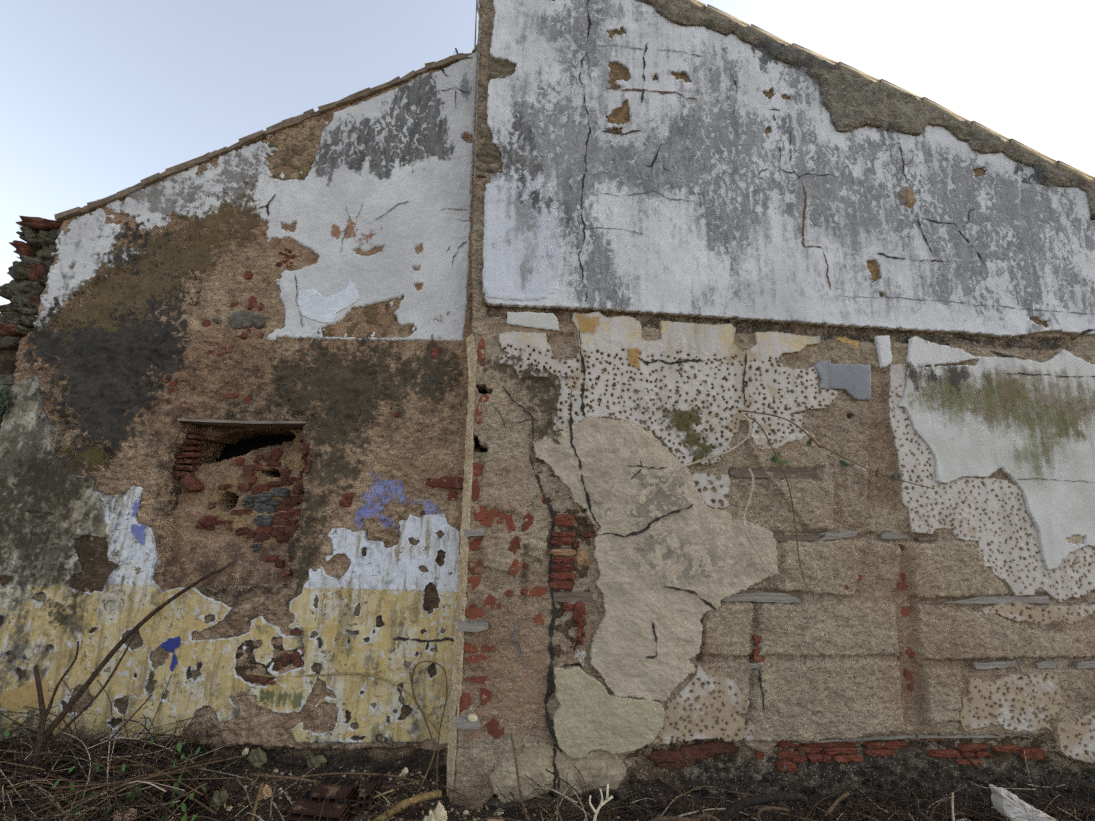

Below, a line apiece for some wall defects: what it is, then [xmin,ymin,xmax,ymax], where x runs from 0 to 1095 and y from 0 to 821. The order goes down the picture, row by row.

spalling [54,53,473,223]
water stain [331,218,377,245]
crack [578,0,738,301]
water stain [493,0,1095,332]
crack [758,109,1095,334]
water stain [0,144,266,626]
peeling [122,630,202,699]
spalling [235,629,322,686]
flaking render [339,462,534,590]
crack [495,387,562,792]
crack [569,330,693,539]
water stain [906,361,1095,455]